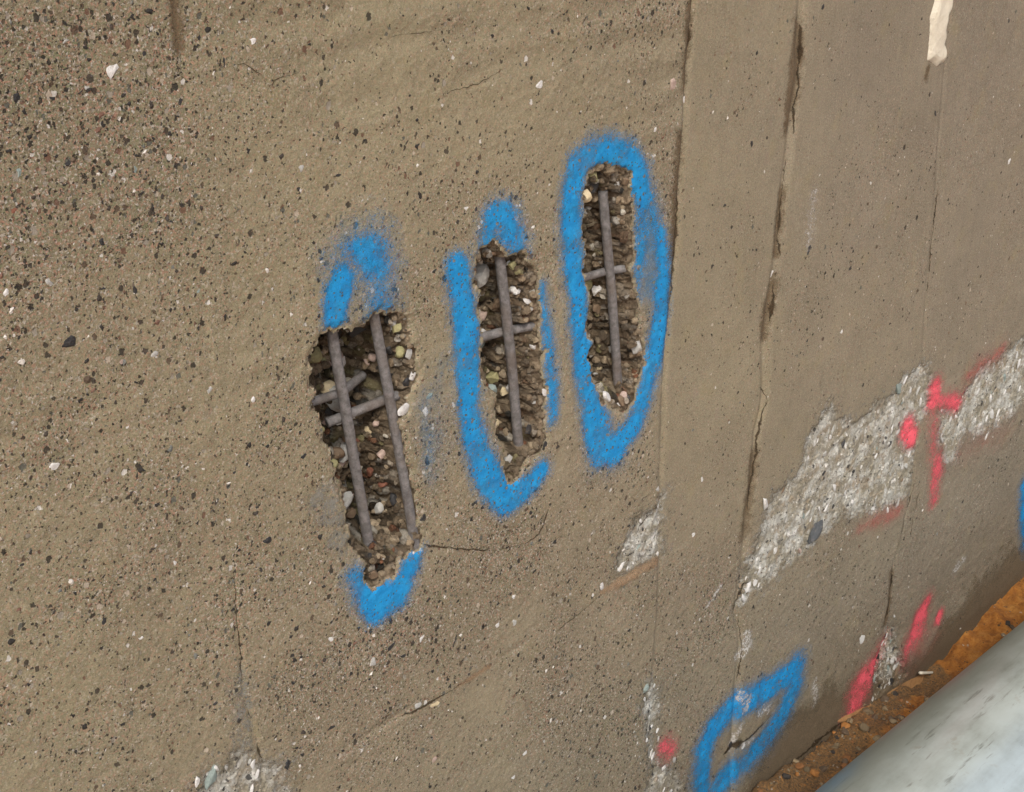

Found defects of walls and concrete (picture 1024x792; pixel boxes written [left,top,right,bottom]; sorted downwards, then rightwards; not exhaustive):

crack [792,25,803,134]
crack [777,161,786,255]
spalling [472,240,546,482]
spalling [582,163,643,411]
crack [768,287,776,321]
spalling [308,311,422,587]
spalling [605,484,675,575]
crack [747,387,767,510]
spalling [735,337,1024,607]